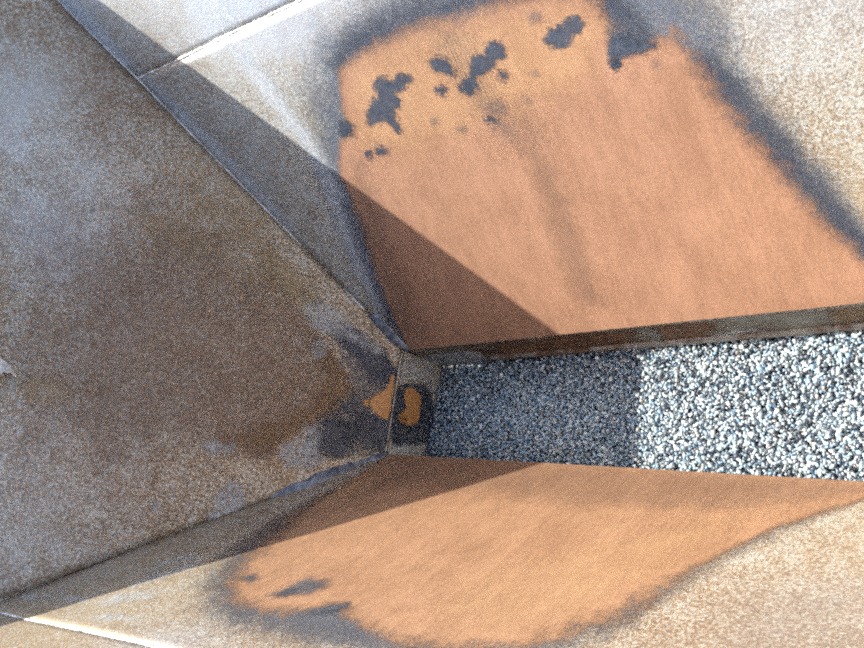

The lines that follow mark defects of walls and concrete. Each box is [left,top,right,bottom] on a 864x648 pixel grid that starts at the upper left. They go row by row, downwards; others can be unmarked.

damp [59,0,128,64]
damp [228,0,526,345]
rust [339,0,864,355]
damp [586,0,864,263]
damp [262,247,485,469]
rust [364,375,421,425]
efflorescence [210,483,245,519]
damp [211,524,610,648]
rust [228,454,864,648]